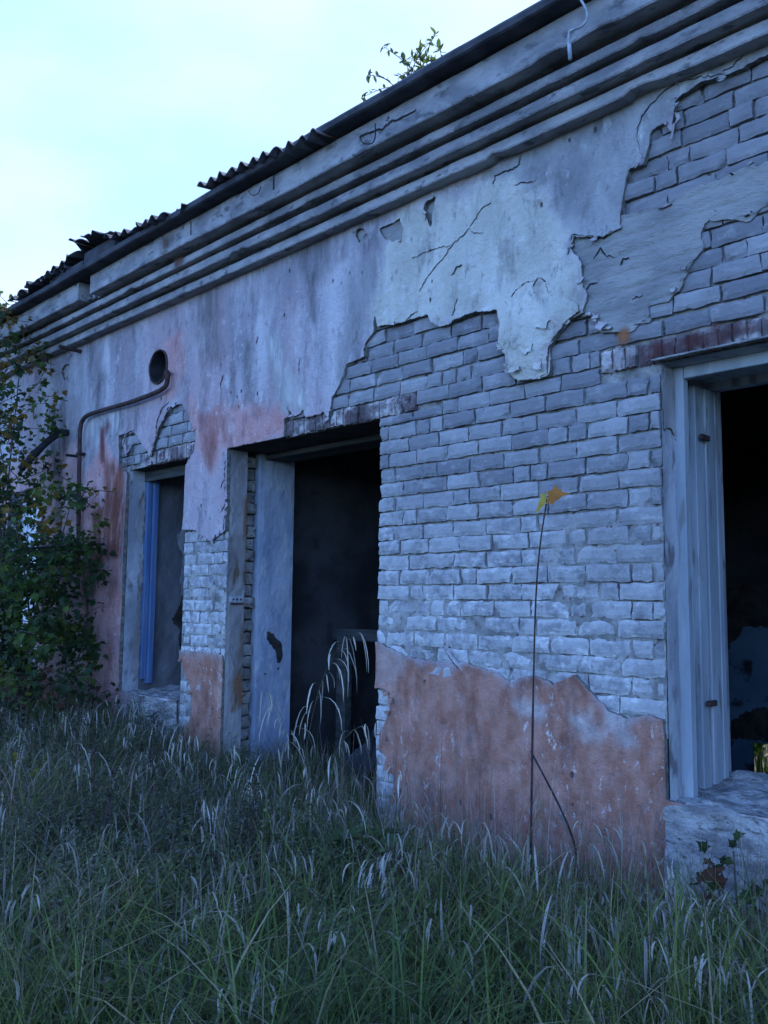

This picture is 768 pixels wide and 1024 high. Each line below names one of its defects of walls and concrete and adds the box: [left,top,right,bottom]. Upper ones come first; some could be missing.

crack [404,156,538,323]
flaking render [122,404,196,486]
flaking render [287,59,768,742]
flaking render [171,530,235,735]